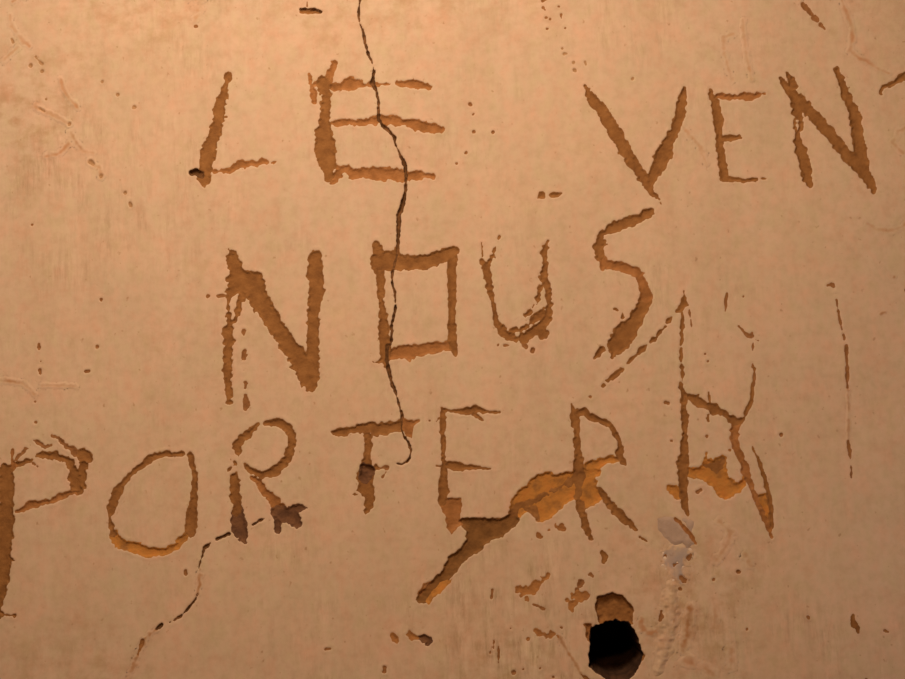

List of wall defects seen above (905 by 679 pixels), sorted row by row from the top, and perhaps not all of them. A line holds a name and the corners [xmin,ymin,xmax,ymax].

crack [357,0,412,465]
crack [126,532,231,679]
peeling [416,469,602,613]
spalling [581,610,664,679]
peeling [666,484,680,500]